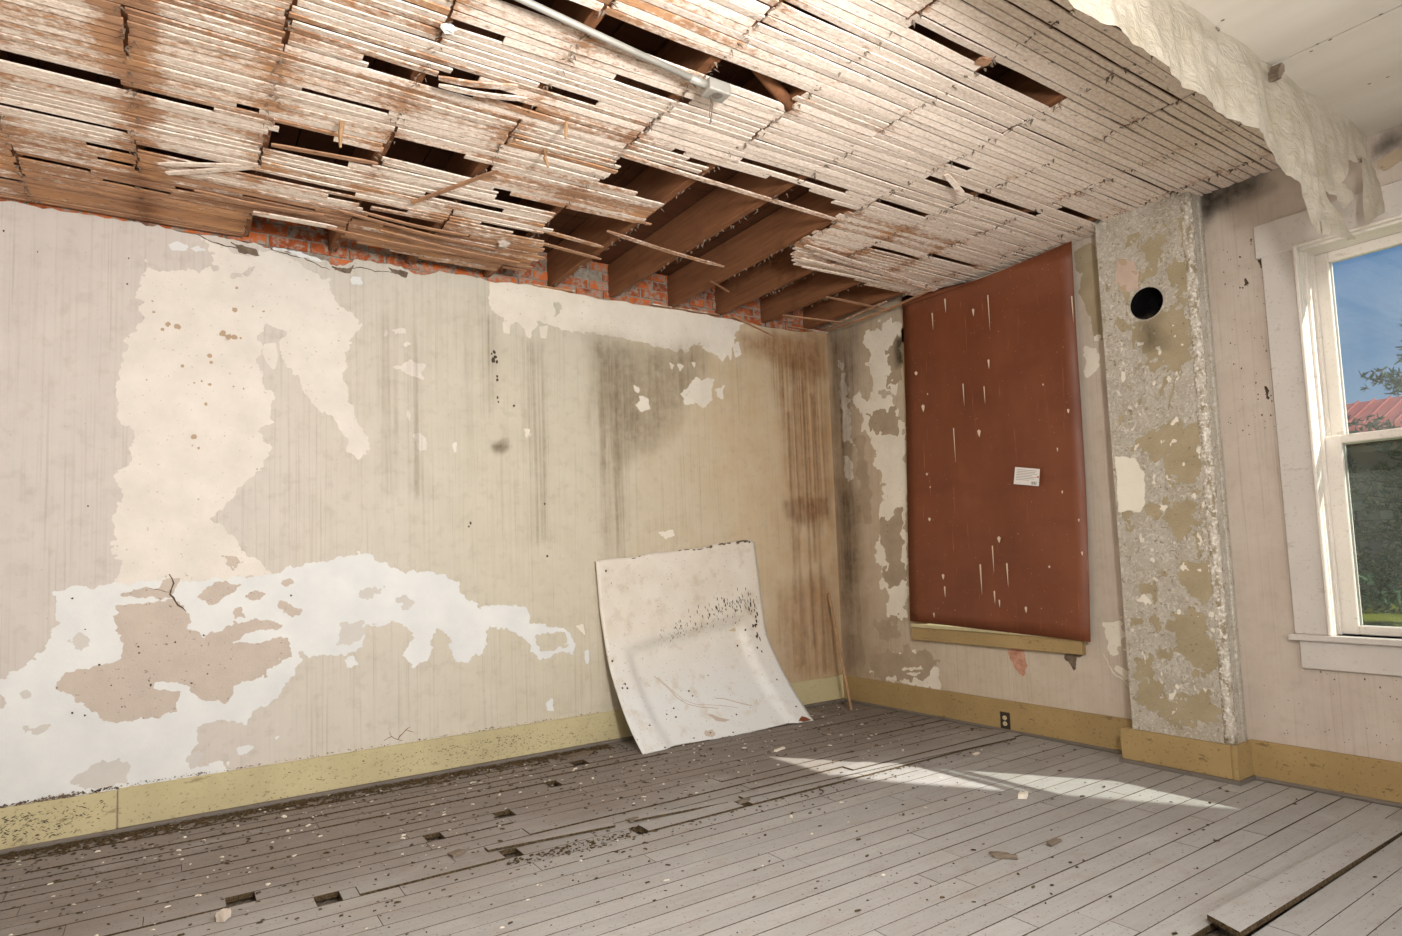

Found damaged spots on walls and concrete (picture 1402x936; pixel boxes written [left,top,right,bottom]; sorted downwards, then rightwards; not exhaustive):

peeling [0,238,589,807]
peeling [488,282,744,412]
peeling [658,530,750,551]
peeling [838,318,941,690]
peeling [1074,217,1225,730]